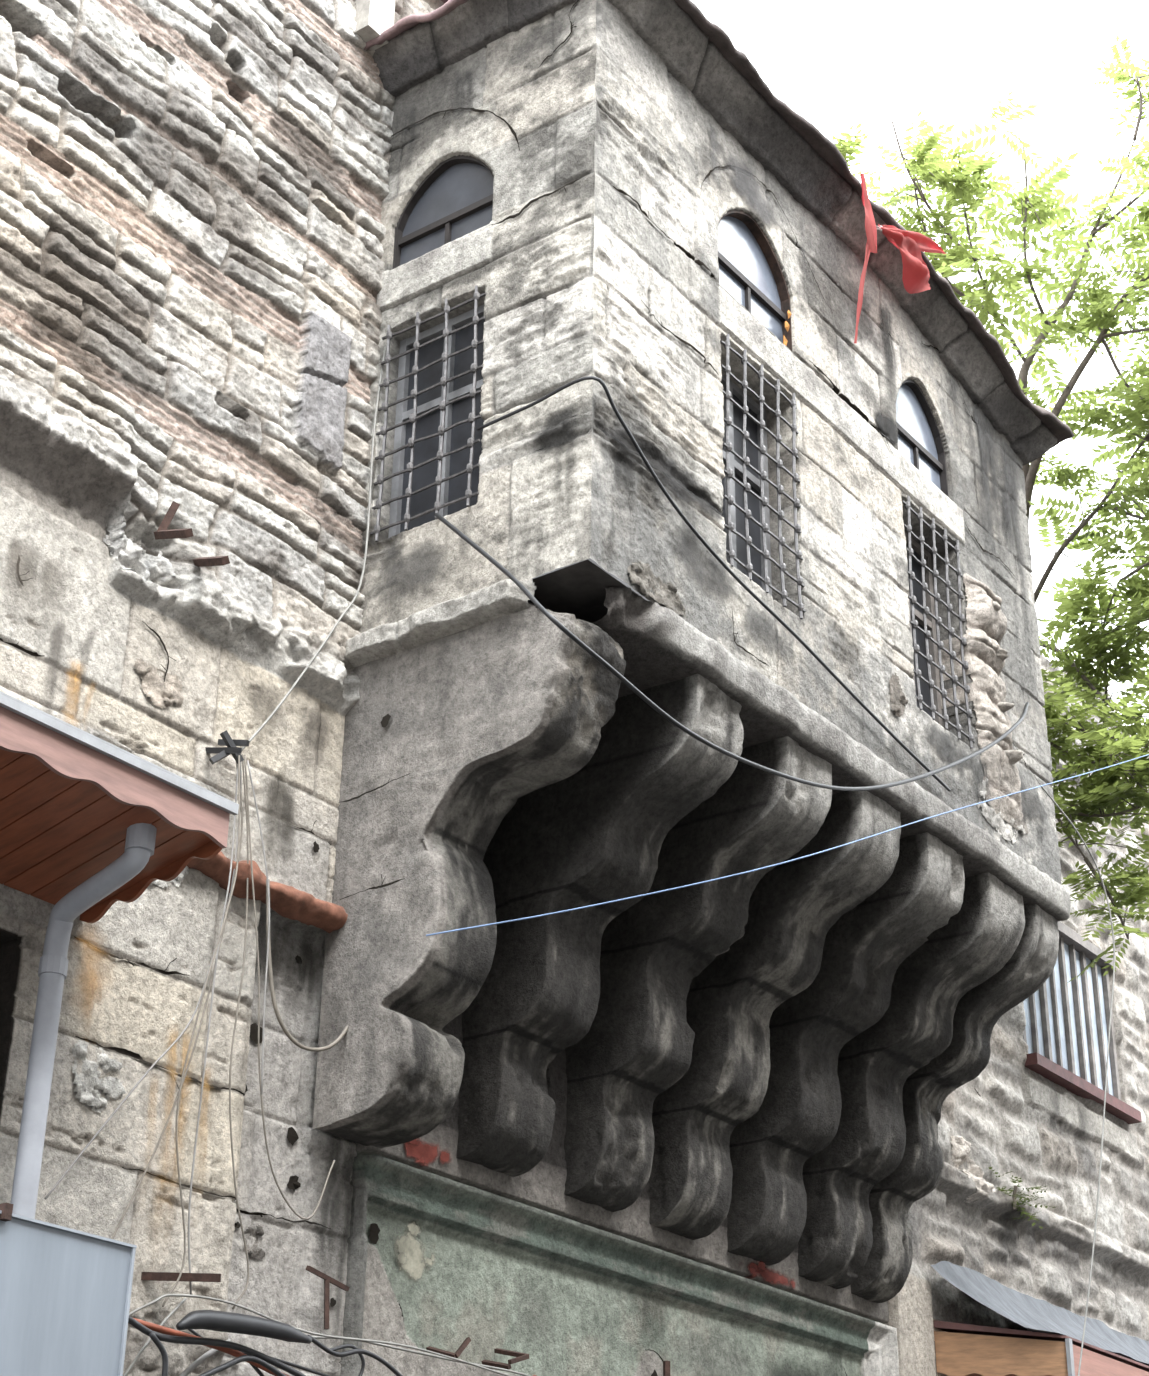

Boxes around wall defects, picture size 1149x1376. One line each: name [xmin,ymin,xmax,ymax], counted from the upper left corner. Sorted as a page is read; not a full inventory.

crack [391,107,520,151]
spalling [103,521,177,587]
spalling [134,658,184,709]
spalling [977,777,1026,844]
peeling [395,1221,435,1280]